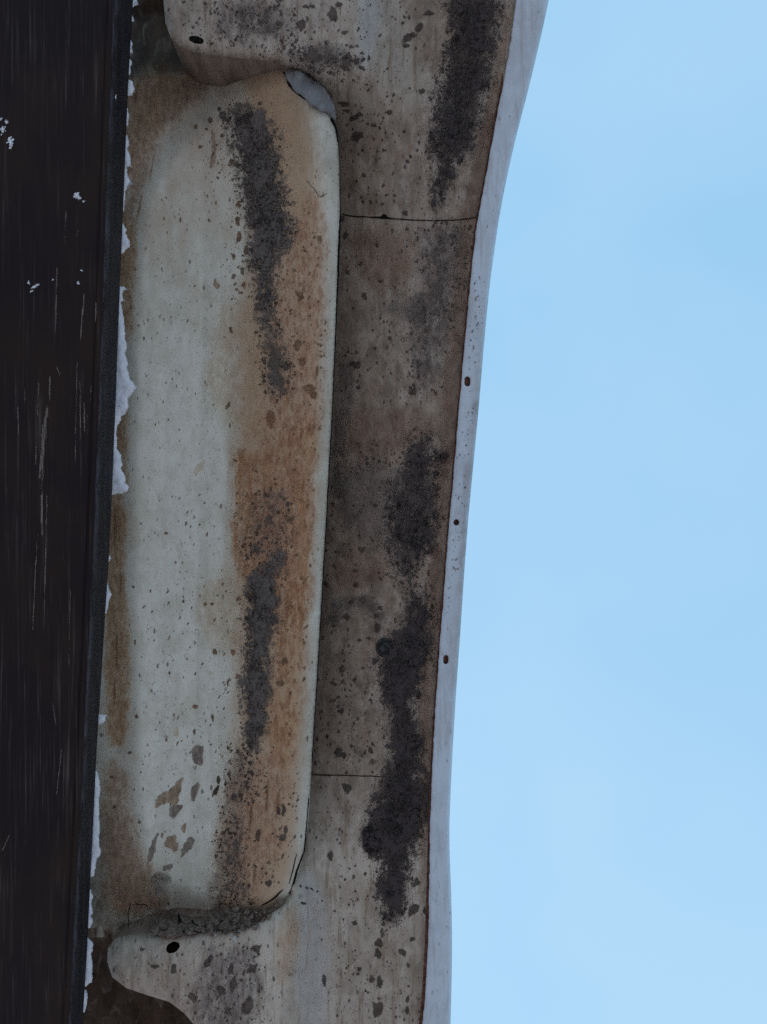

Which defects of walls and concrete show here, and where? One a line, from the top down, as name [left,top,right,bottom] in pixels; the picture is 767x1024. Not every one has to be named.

crack [330,117,340,163]
crack [261,181,476,906]
water stain [342,596,382,642]